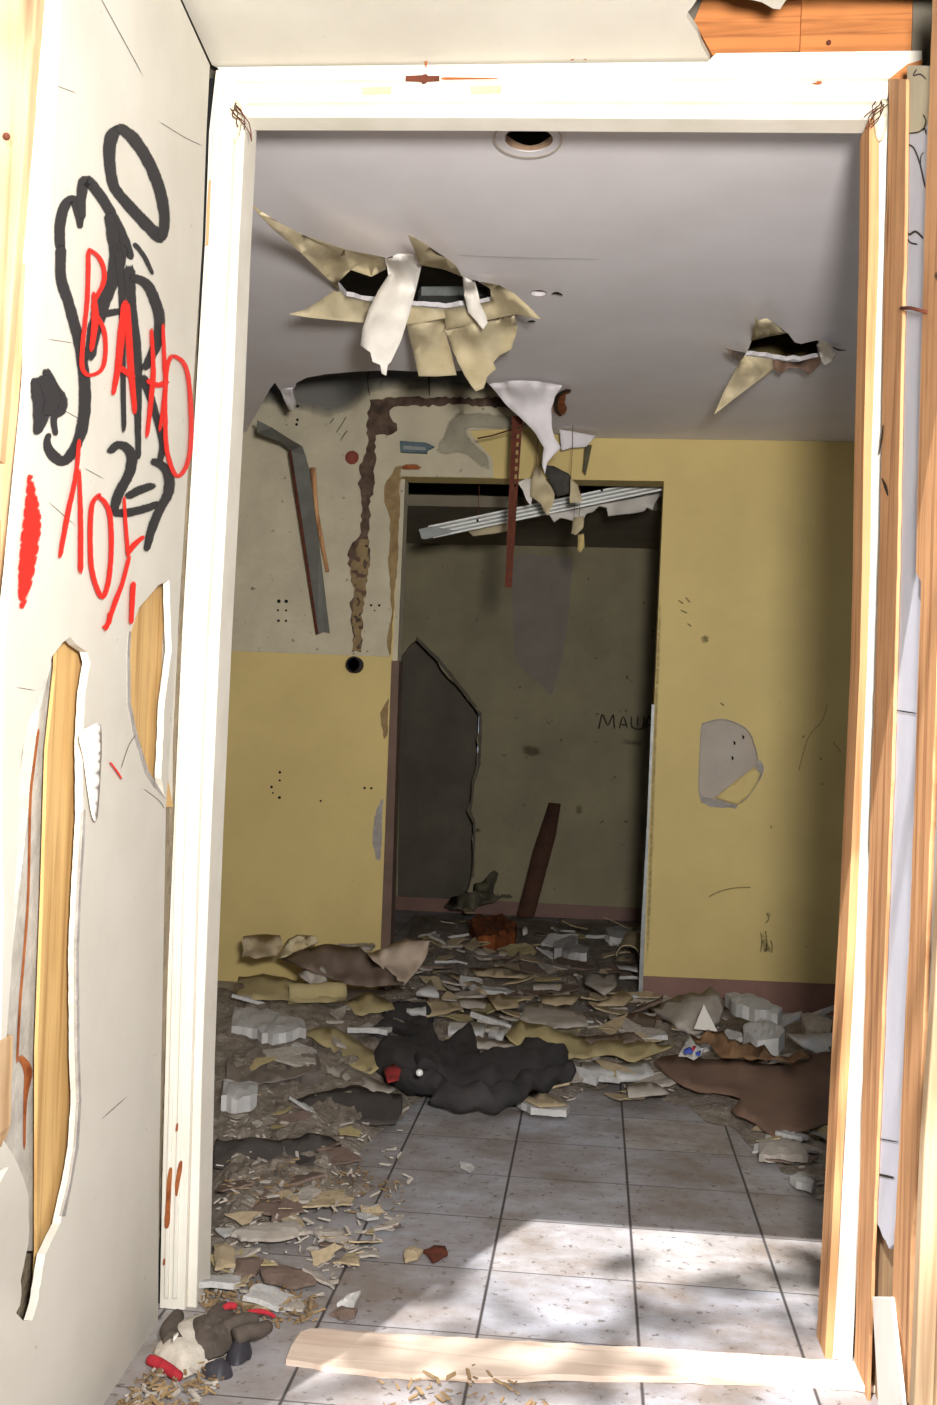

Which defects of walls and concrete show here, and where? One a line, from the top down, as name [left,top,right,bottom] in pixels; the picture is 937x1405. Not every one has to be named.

spalling [127,630,165,798]
spalling [698,719,764,809]
spalling [59,723,102,1216]